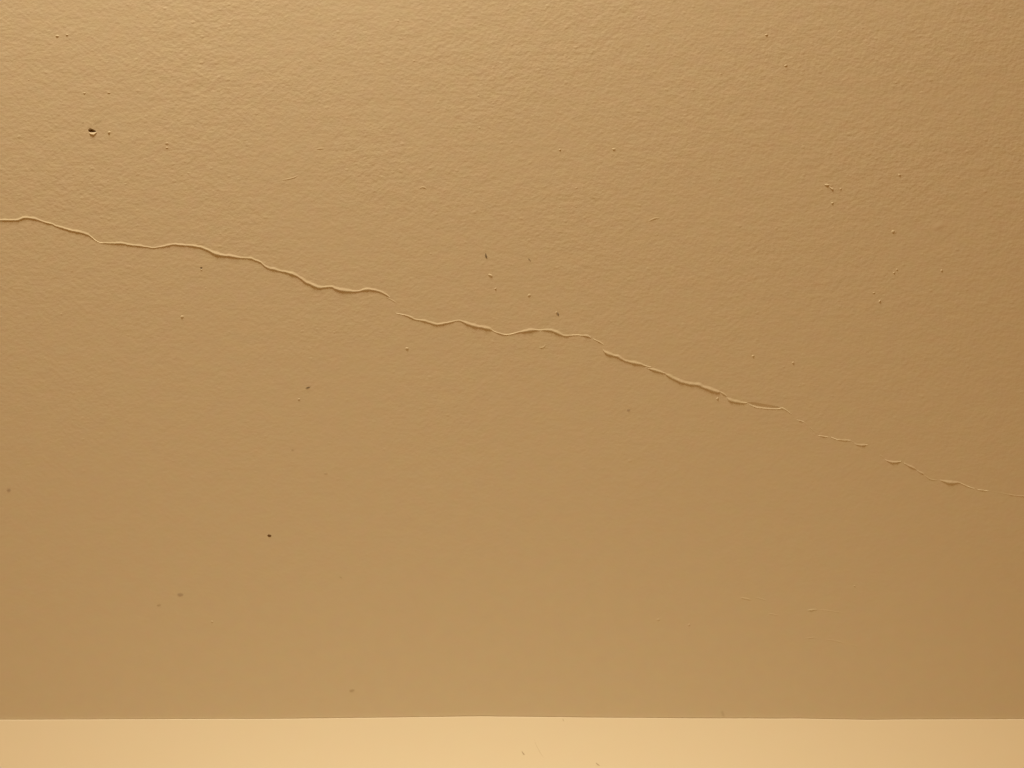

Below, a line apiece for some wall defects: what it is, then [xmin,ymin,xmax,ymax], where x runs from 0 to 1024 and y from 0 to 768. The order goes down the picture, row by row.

crack [0,216,1024,497]